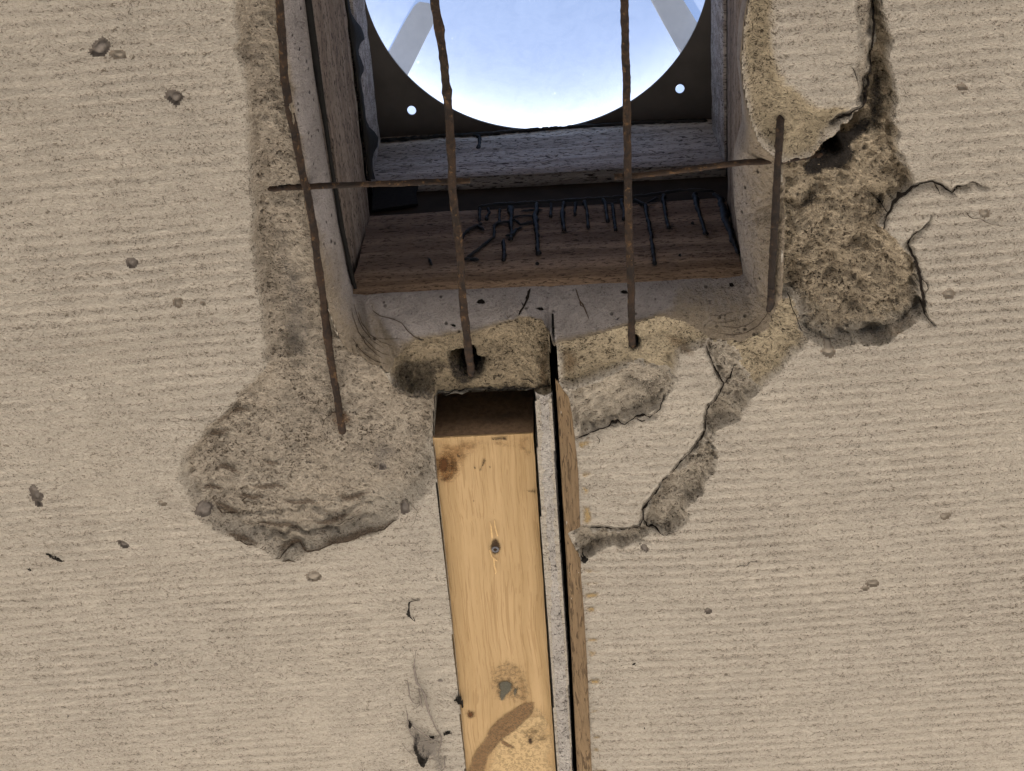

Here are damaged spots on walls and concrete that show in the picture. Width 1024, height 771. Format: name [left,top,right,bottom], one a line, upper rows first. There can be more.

spalling [174,0,929,563]
crack [907,224,932,323]
crack [863,181,999,230]
crack [579,346,734,536]